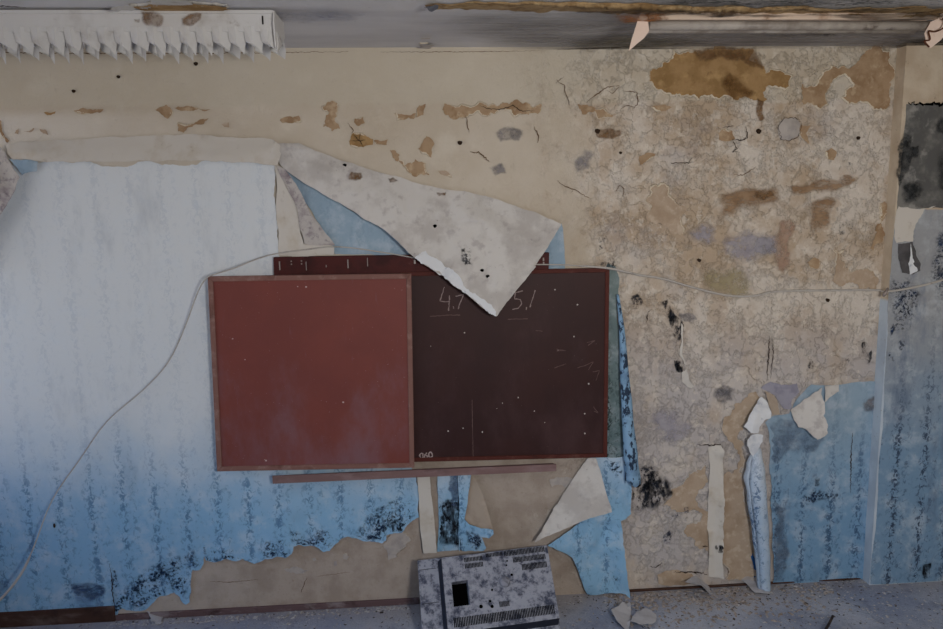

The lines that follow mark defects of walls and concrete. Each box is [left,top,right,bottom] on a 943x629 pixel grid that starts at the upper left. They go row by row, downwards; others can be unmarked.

peeling [424,0,943,18]
leakage [492,0,943,68]
peeling [321,101,340,132]
peeling [349,117,452,178]
peeling [394,104,426,121]
leakage [725,75,764,121]
peeling [649,46,896,112]
mould [896,135,921,202]
mould [889,282,919,359]
mould [632,467,672,509]
peeling [722,392,770,594]
leakage [71,547,234,612]